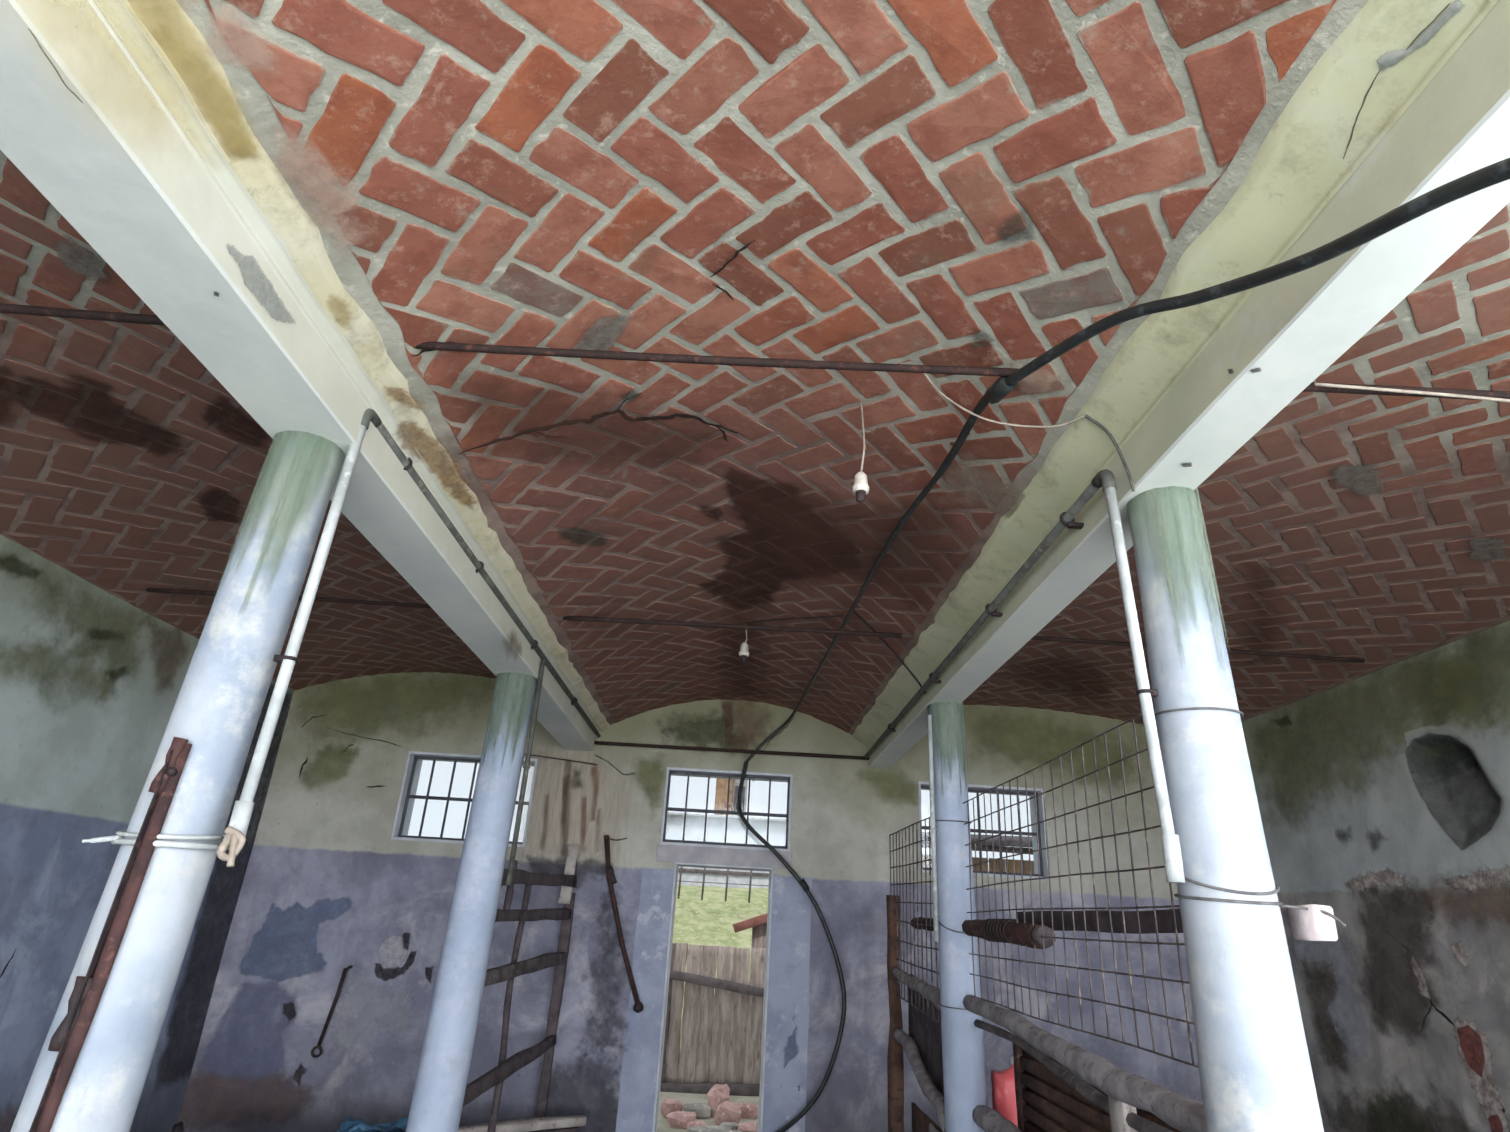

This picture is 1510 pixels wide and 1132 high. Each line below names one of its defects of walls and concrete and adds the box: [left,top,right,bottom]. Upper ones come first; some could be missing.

water stain [0,367,178,454]
water stain [199,398,323,603]
rust [389,389,475,506]
crack [458,393,738,455]
water stain [702,472,859,608]
water stain [662,701,761,748]
flaking render [1406,734,1501,850]
peeling [1444,865,1510,892]
peeling [204,898,351,1085]
flaking render [1454,1017,1508,1132]